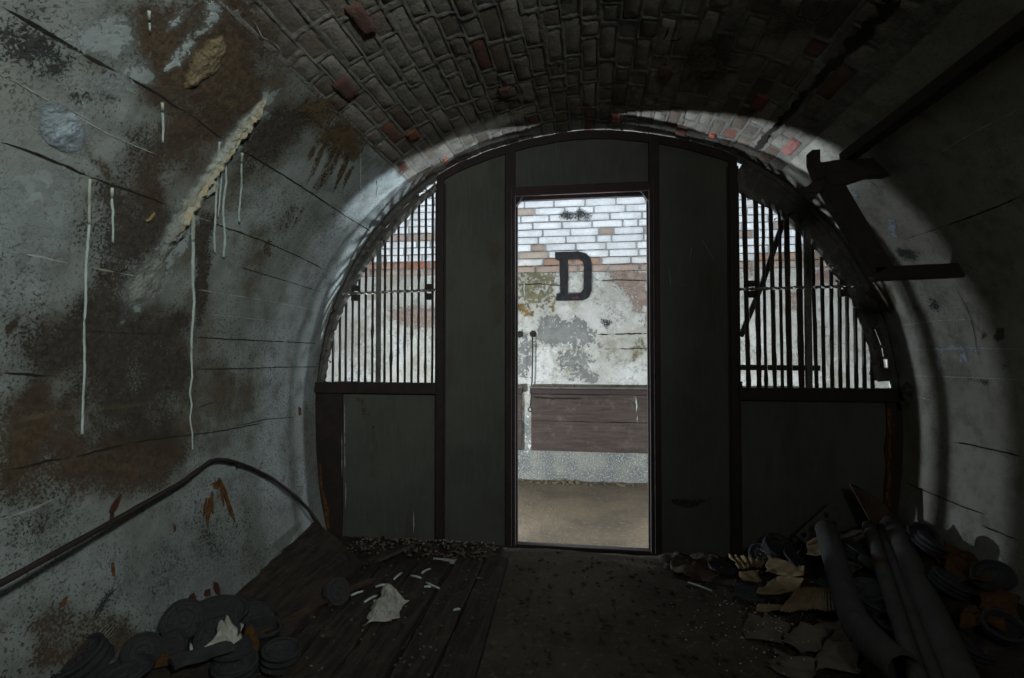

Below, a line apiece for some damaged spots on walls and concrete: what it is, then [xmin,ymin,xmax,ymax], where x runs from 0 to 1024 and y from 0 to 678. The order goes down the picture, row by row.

crack [0,5,368,230]
corrosion [307,143,355,194]
crack [201,218,323,292]
leakage [0,0,369,567]
crack [3,417,292,471]
crack [955,442,1023,459]
corrosion [109,494,122,520]
corrosion [204,478,235,528]